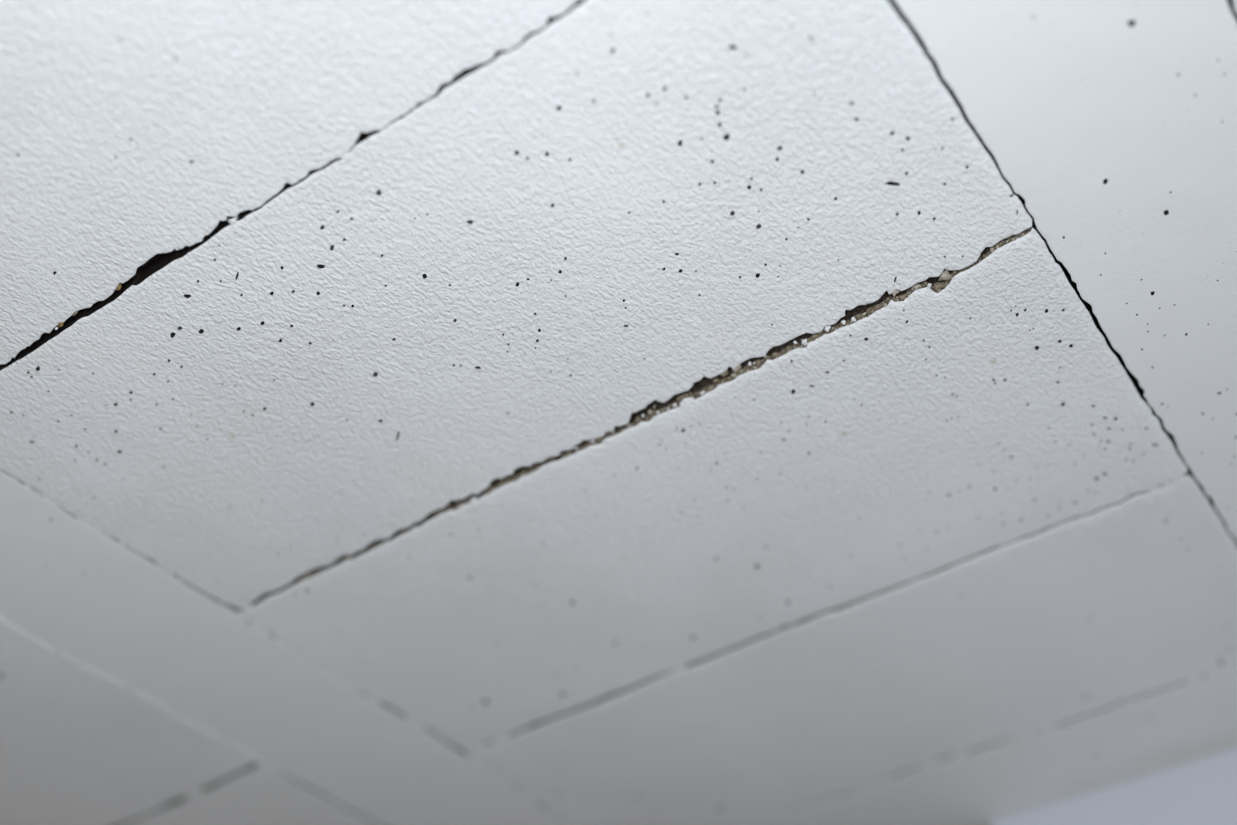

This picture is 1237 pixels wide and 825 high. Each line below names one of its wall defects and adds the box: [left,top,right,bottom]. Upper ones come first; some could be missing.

crack [0,0,585,371]
crack [102,0,1237,625]
crack [509,482,1173,737]